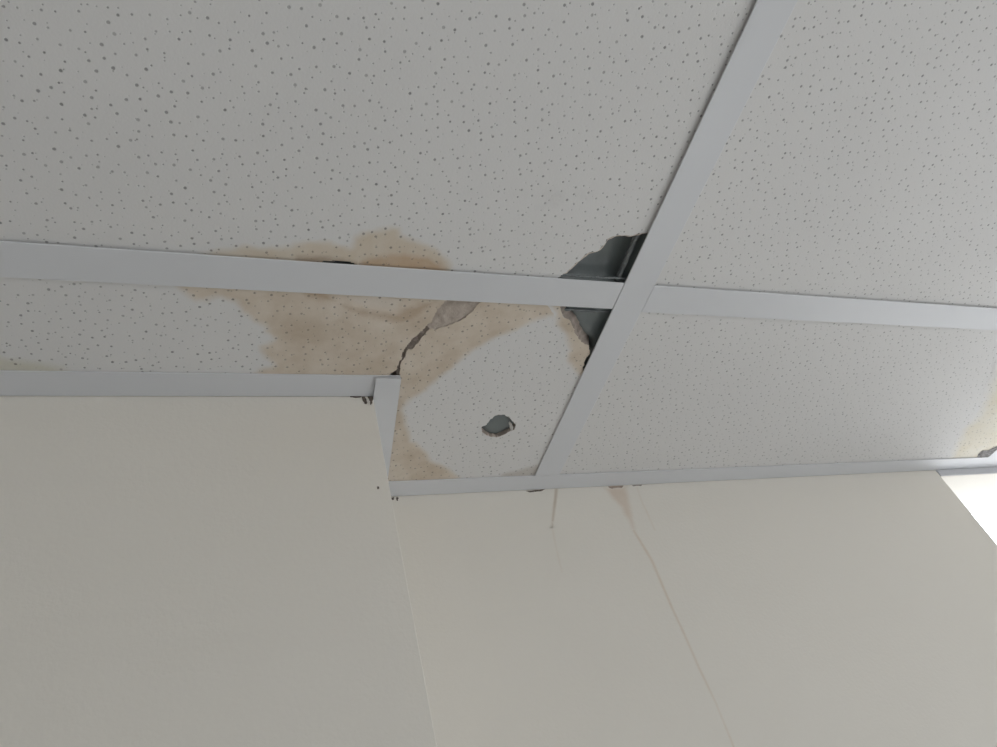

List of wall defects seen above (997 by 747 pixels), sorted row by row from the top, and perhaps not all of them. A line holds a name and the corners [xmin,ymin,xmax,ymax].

water stain [194,223,456,271]
water stain [172,286,590,481]